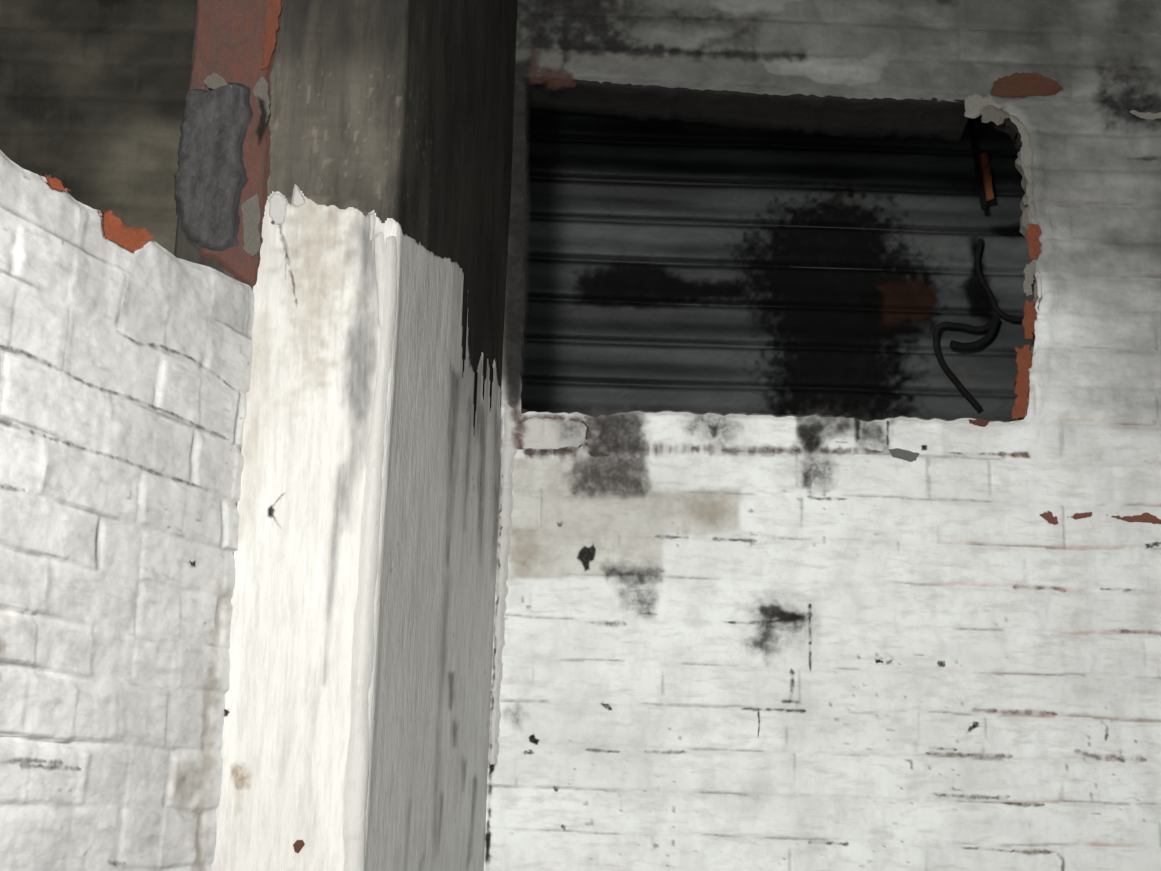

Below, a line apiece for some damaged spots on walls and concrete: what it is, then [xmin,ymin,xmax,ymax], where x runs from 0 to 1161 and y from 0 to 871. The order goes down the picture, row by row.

leakage [533,22,758,62]
leakage [1129,110,1161,120]
spalling [102,210,154,253]
spalling [964,72,1063,424]
spalling [969,418,989,427]
peeling [1040,511,1092,525]
peeling [1111,513,1161,524]